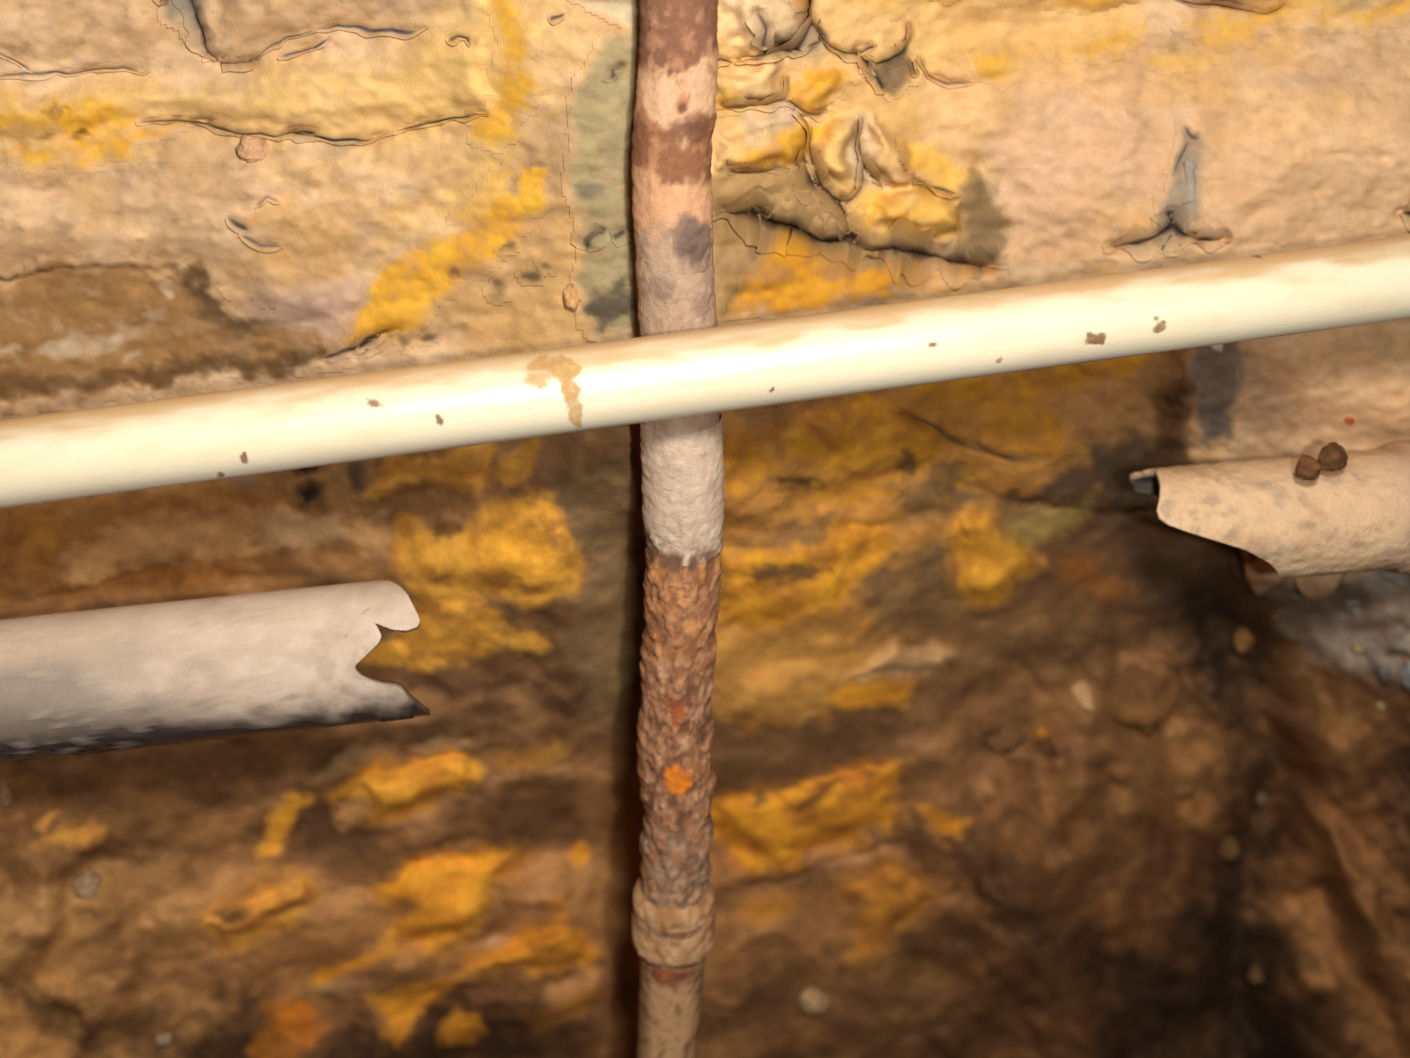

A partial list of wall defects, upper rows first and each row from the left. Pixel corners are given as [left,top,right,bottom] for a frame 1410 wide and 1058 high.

crack [0,52,151,80]
crack [153,0,471,72]
crack [135,113,489,145]
damp [0,0,641,415]
crack [1102,125,1232,262]
crack [1400,201,1410,232]
damp [286,437,594,677]
damp [711,351,1174,731]
damp [185,732,614,1055]
damp [709,750,977,973]